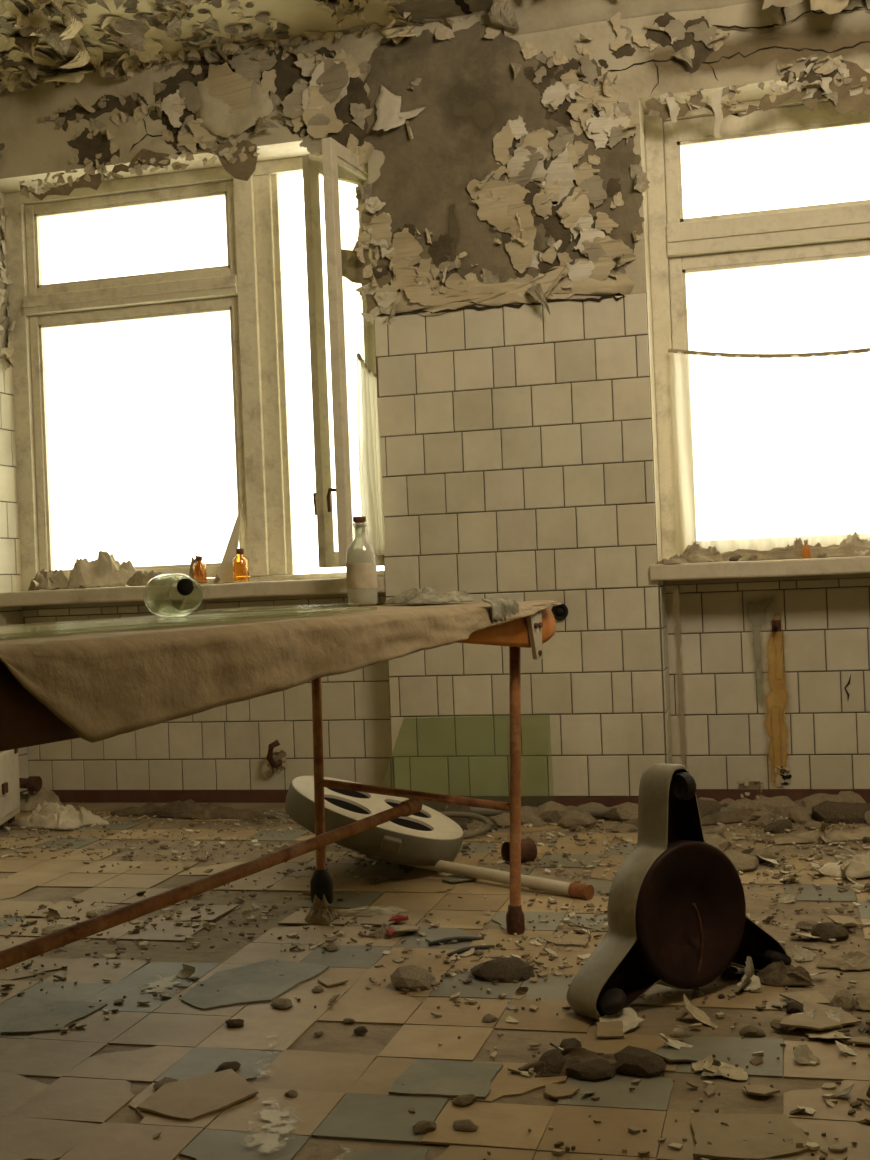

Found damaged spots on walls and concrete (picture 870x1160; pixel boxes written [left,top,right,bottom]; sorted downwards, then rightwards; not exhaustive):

crack [454,0,472,15]
peeling [0,0,870,325]
peeling [0,199,16,372]